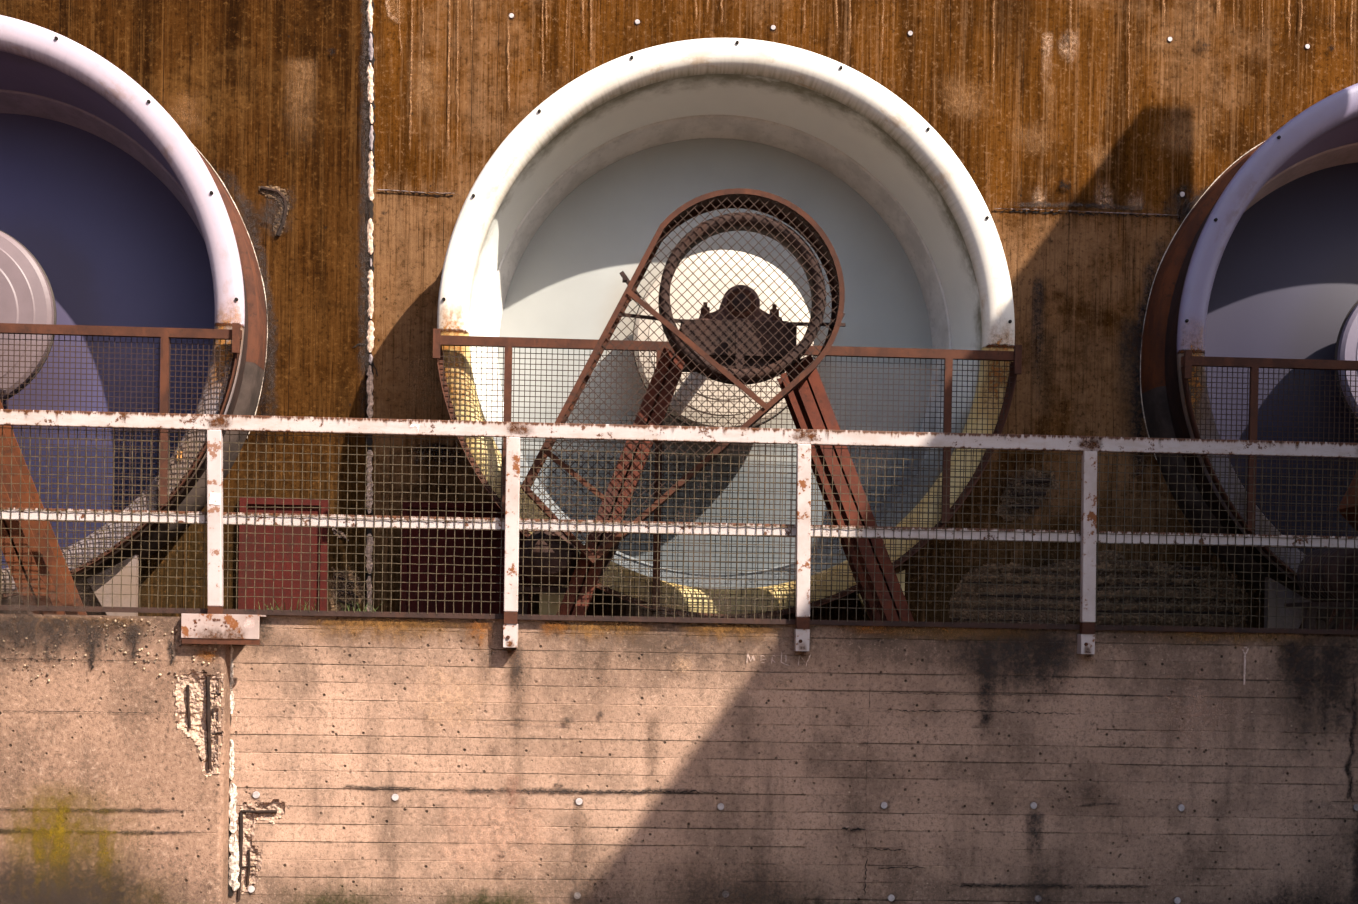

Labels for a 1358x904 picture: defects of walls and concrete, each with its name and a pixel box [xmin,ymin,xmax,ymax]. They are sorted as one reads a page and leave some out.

corrosion [212,311,244,386]
corrosion [440,314,467,403]
corrosion [984,333,1014,401]
spalling [0,616,228,778]
crack [1344,672,1357,801]
spalling [237,798,289,900]